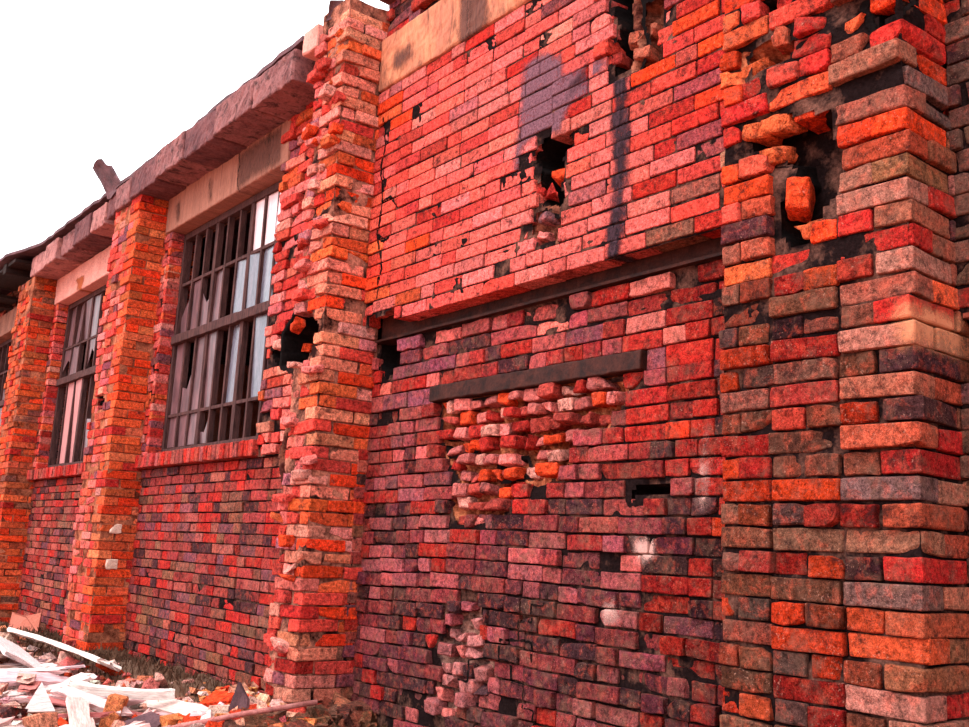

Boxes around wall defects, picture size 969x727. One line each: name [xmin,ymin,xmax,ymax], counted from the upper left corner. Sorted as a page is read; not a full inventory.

spalling [306,57,346,110]
spalling [602,0,665,77]
spalling [741,35,790,79]
spalling [762,0,778,13]
spalling [860,0,917,34]
spalling [301,122,344,149]
crack [376,117,398,299]
spalling [530,134,573,245]
spalling [742,112,822,248]
spalling [272,312,325,375]
spalling [270,416,319,547]
spalling [632,483,671,499]